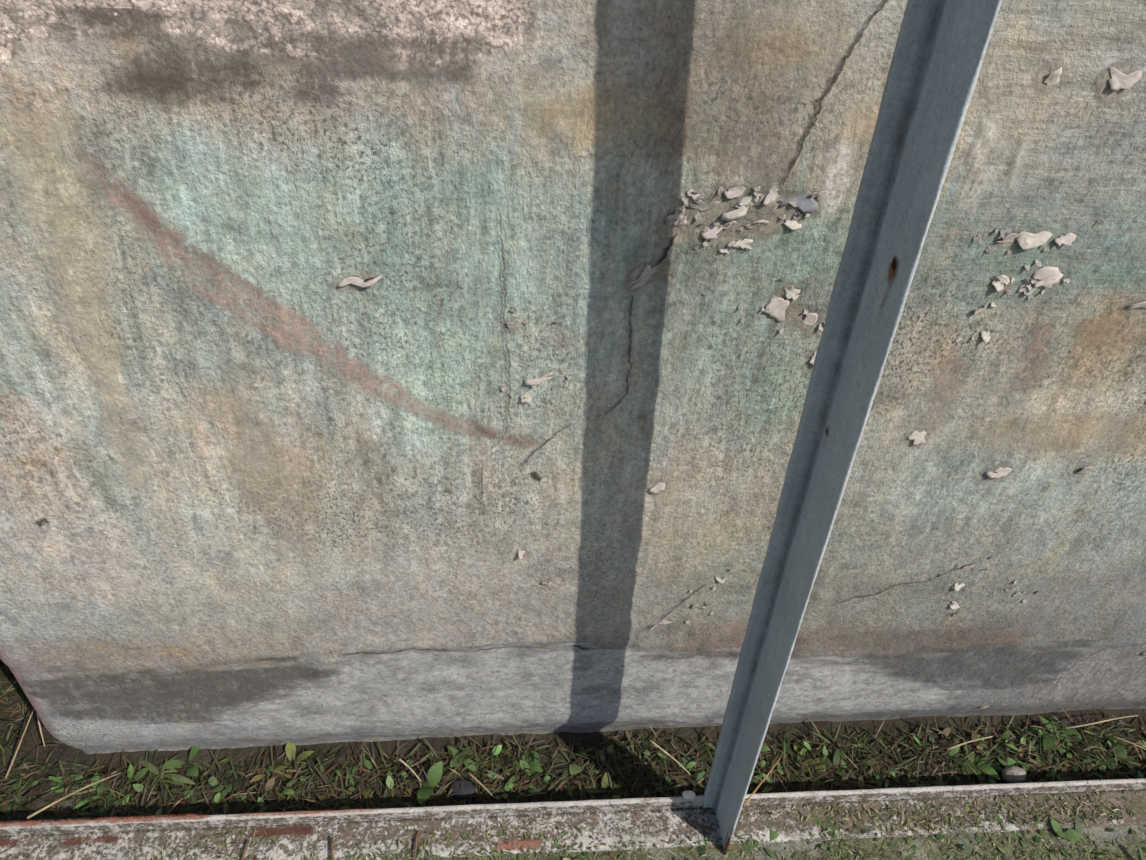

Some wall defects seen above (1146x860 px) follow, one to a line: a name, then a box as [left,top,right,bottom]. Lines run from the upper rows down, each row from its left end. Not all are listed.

leakage [56,5,166,31]
leakage [102,50,255,100]
spalling [0,0,536,72]
leakage [268,34,492,97]
crack [783,0,888,184]
crack [656,233,678,266]
peeling [648,185,828,254]
peeling [973,228,1077,317]
crack [605,296,633,415]
peeling [955,331,991,344]
leakage [22,657,327,724]